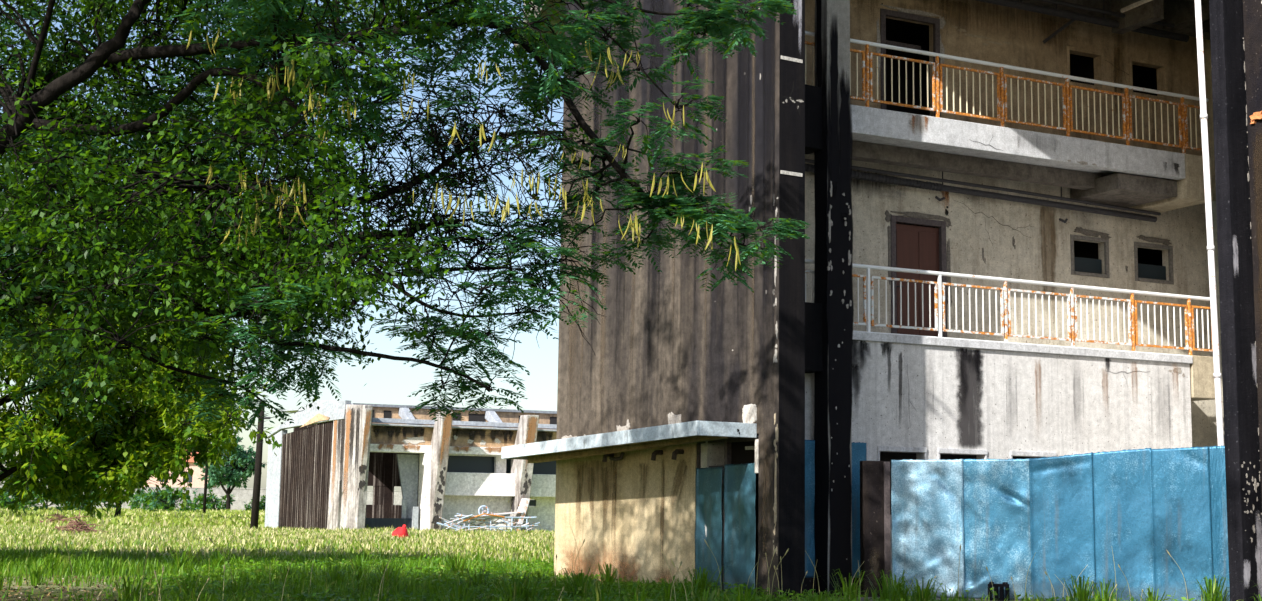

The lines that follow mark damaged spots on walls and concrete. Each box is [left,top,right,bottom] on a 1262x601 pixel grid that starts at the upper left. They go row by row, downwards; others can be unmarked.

spalling [1246,105,1262,182]
peeling [828,181,852,274]
leakage [852,340,903,409]
leakage [957,349,983,448]
peeling [1241,460,1262,542]